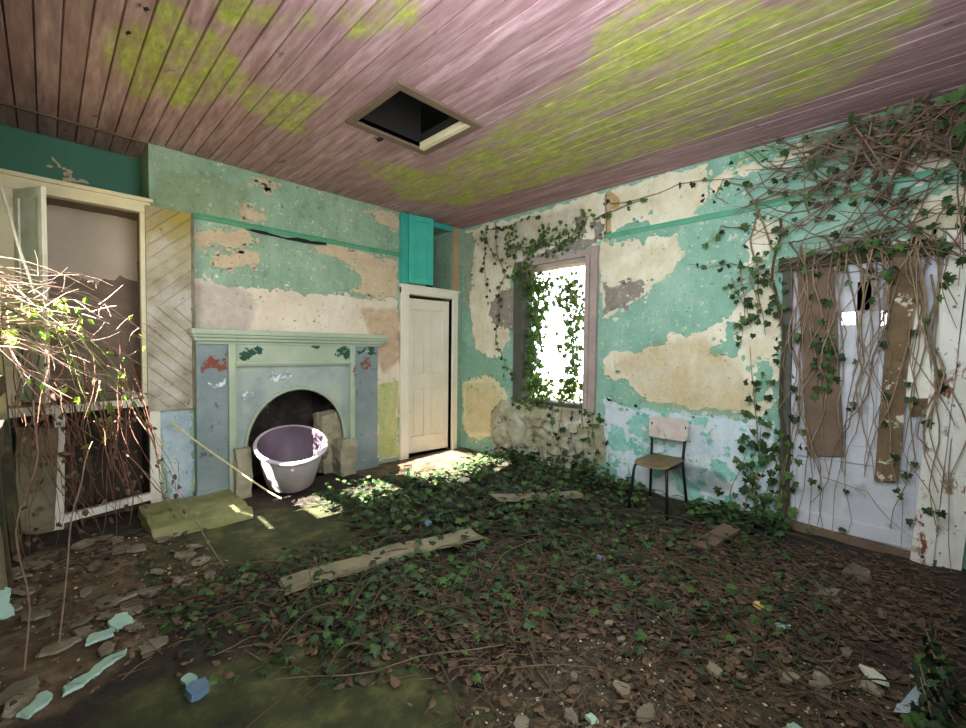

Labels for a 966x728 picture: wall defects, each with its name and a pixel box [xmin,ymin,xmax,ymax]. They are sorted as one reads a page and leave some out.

crack [246,229,327,245]
peeling [194,176,400,461]
peeling [462,373,507,443]
peeling [461,140,817,359]
peeling [600,216,784,514]